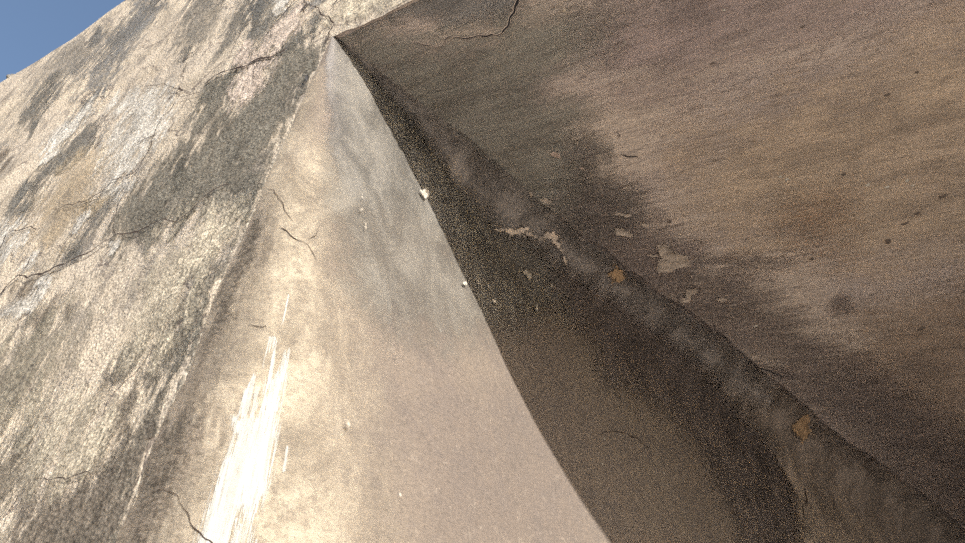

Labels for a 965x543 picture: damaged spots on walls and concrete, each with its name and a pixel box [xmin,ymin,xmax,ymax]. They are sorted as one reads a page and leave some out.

crack [411,0,520,47]
leakage [332,0,965,543]
leakage [263,337,277,391]
leakage [238,374,256,417]
crack [160,489,213,543]